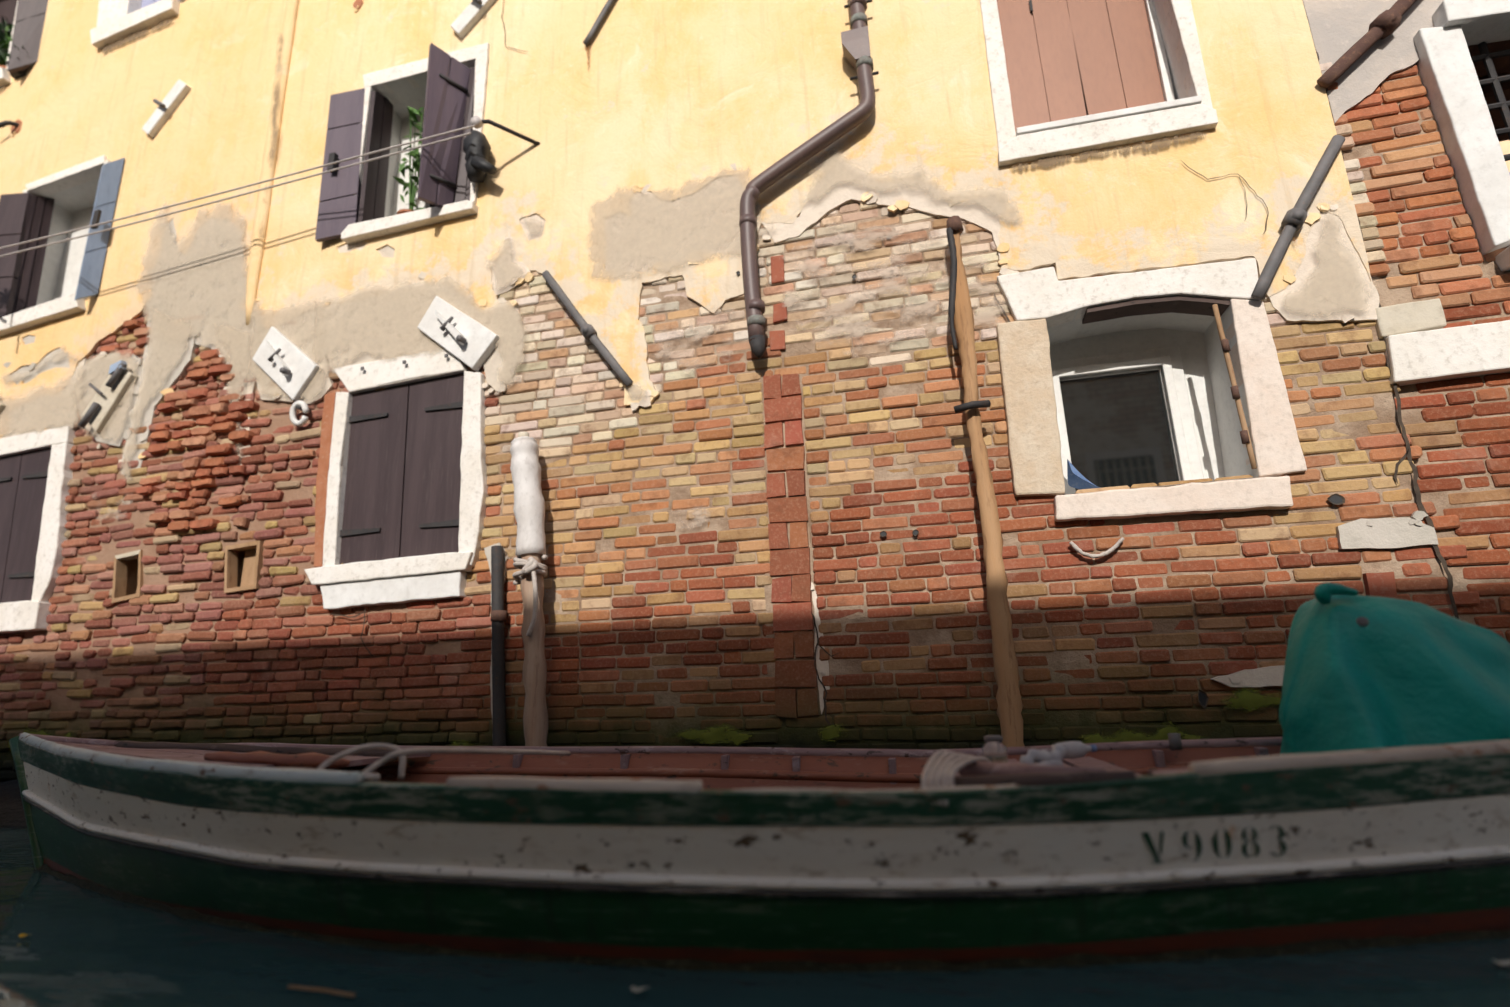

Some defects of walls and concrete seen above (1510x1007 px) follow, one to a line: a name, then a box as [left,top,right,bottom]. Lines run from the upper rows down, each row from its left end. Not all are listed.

flaking render [591,153,1019,278]
crack [1182,161,1269,234]
flaking render [1268,203,1379,323]
flaking render [0,203,554,478]
flaking render [619,378,660,412]
crack [811,612,840,725]